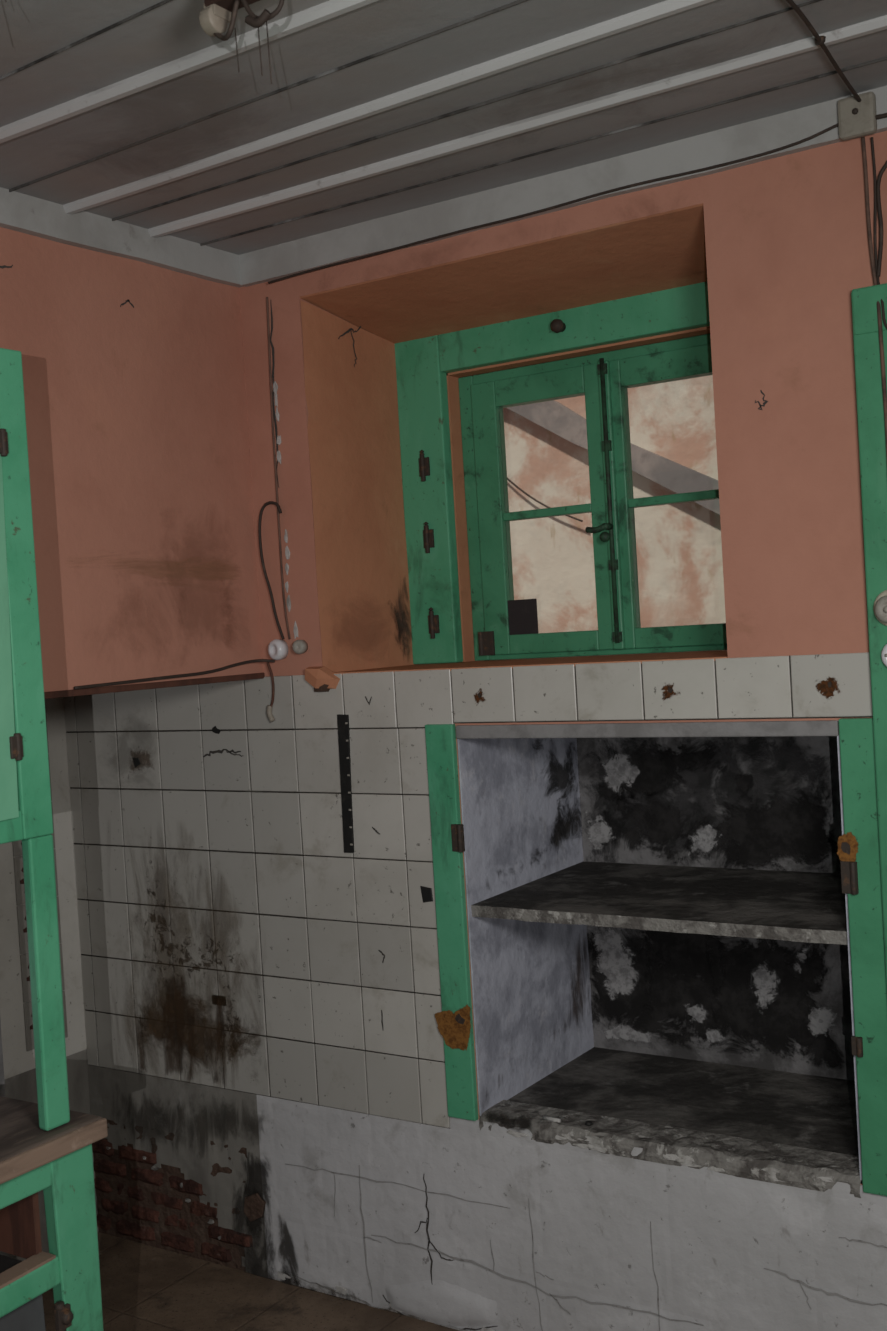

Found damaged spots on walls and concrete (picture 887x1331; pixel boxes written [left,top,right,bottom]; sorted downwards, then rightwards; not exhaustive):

corrosion [661,685,680,700]
corrosion [816,676,840,699]
leakage [536,736,838,871]
leakage [138,889,256,1081]
leakage [587,927,845,1068]
spalling [92,1120,253,1271]
crack [287,1164,704,1331]
spalling [479,1100,861,1198]
crack [764,1268,887,1309]
crack [839,1237,887,1248]